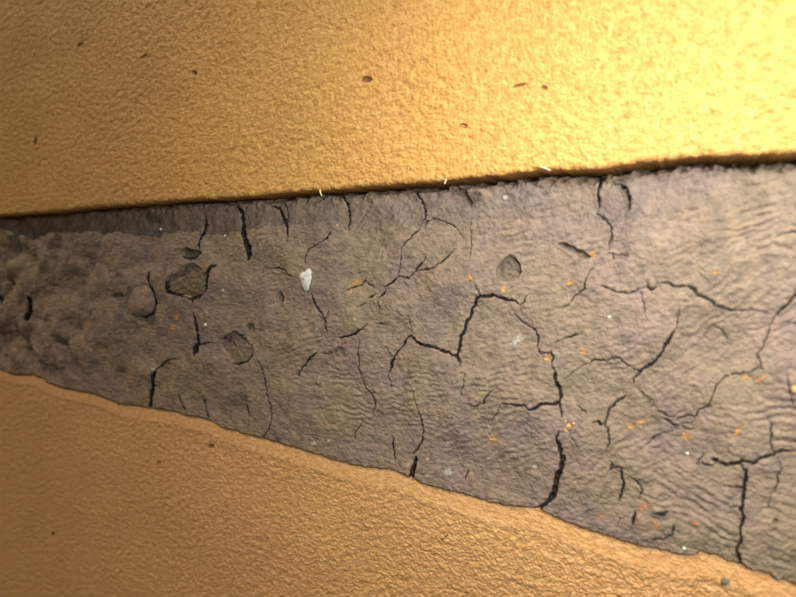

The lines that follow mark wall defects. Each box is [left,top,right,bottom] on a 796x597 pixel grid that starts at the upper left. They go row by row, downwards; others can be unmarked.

spalling [165,248,217,302]
crack [237,207,252,261]
spalling [495,255,521,282]
spalling [558,243,590,260]
crack [596,177,628,259]
spalling [614,183,631,213]
crack [298,191,472,441]
crack [149,313,210,408]
spalling [222,323,255,365]
crack [385,268,796,509]
crack [696,417,796,563]
crack [619,511,674,541]